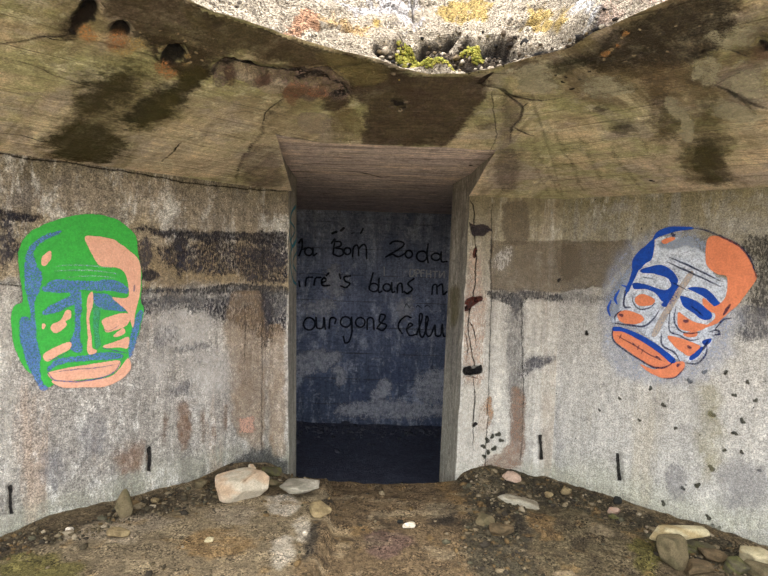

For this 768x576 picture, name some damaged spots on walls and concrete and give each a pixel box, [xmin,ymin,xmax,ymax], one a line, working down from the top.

leakage [51,71,135,163]
spalling [59,0,147,56]
spalling [155,43,191,79]
leakage [100,0,490,147]
crack [479,83,562,149]
leakage [580,26,768,185]